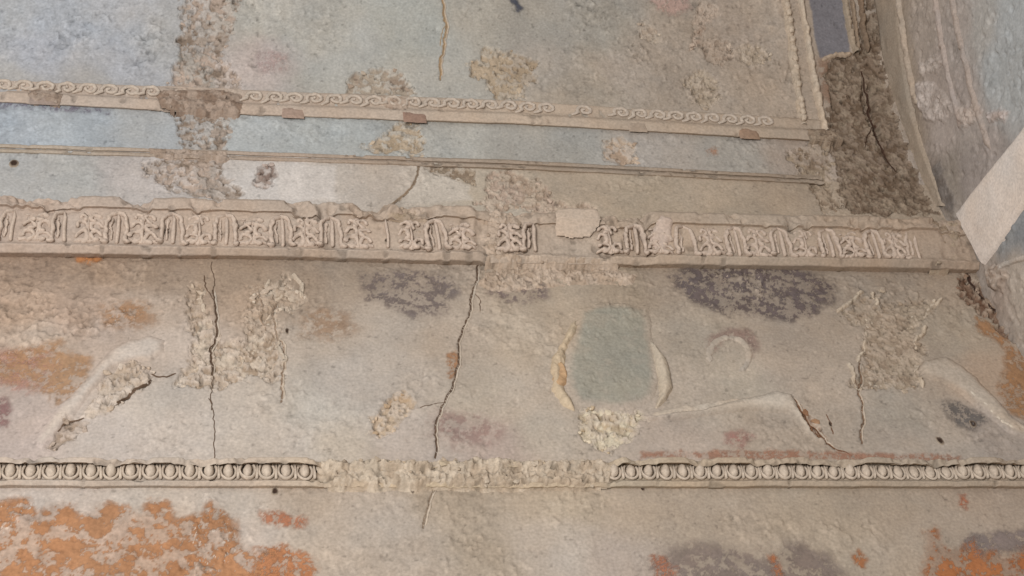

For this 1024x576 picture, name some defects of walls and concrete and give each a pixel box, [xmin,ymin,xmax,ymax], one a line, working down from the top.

spalling [160,0,243,105]
crack [438,0,450,80]
spalling [140,112,279,202]
spalling [785,0,941,218]
crack [860,71,896,172]
crack [204,262,220,458]
spalling [172,272,309,393]
water stain [365,272,457,317]
crack [420,265,481,458]
water stain [675,268,834,321]
crack [794,362,866,454]
spalling [836,287,943,394]